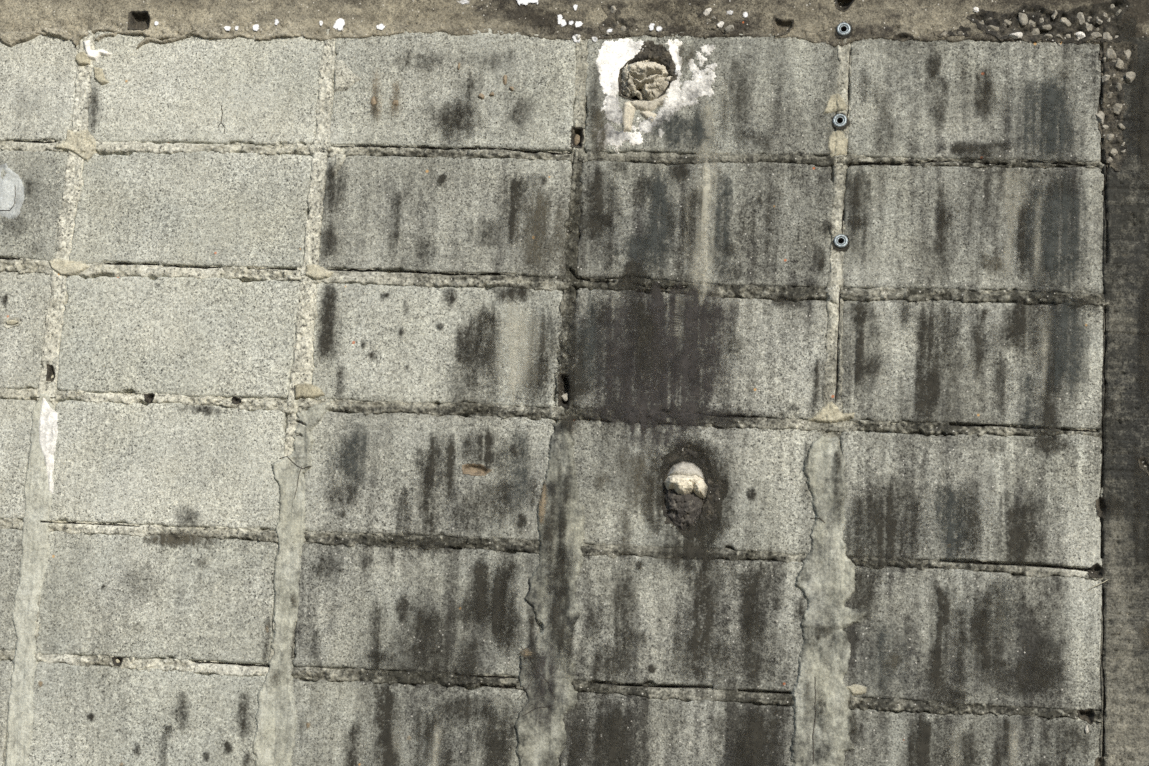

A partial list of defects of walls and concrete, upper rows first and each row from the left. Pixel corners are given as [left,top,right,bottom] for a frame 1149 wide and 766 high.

peeling [570,38,717,154]
damp [318,285,336,356]
damp [455,285,554,403]
damp [561,106,740,687]
damp [851,298,882,385]
damp [901,303,959,429]
damp [397,428,538,551]
spalling [661,444,728,538]
damp [835,452,918,568]
damp [453,466,572,729]
damp [926,580,1060,705]
damp [375,685,400,766]